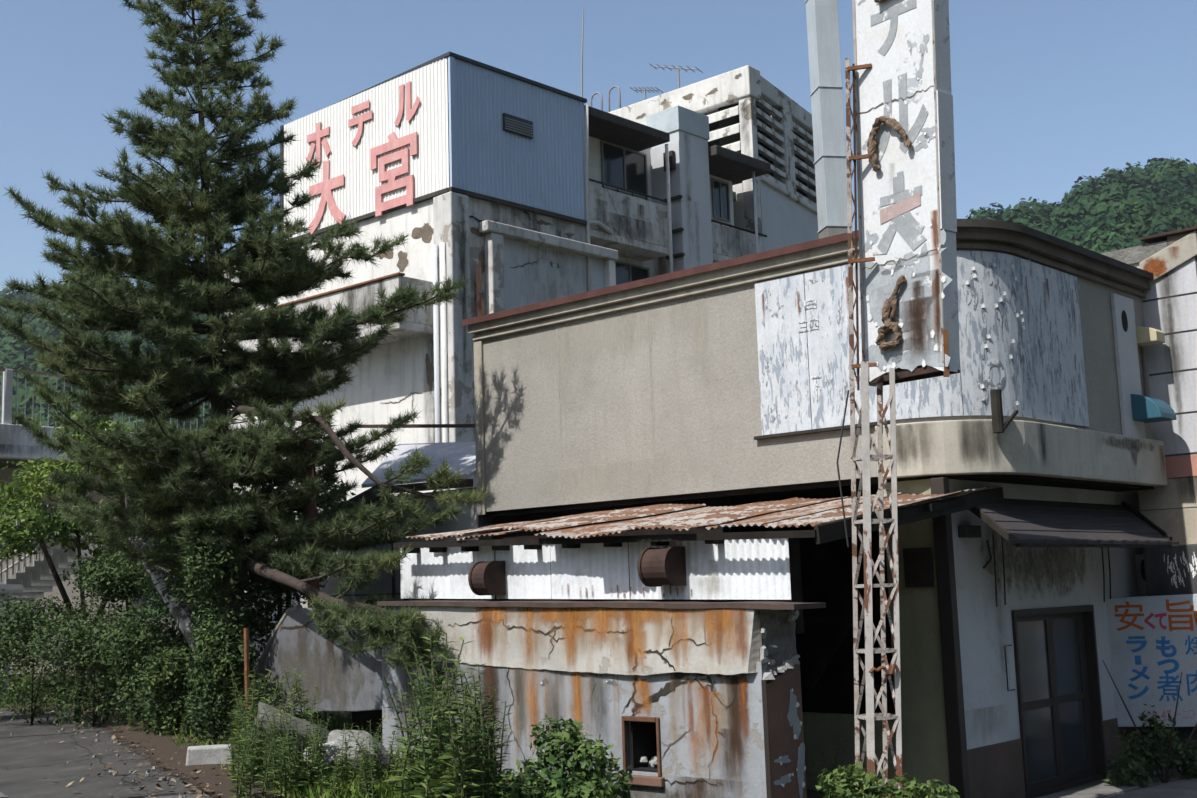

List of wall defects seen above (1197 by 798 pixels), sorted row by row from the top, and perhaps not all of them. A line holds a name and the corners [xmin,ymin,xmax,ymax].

spalling [375,248,408,272]
spalling [411,223,434,243]
corrosion [1144,247,1175,277]
peeling [964,261,1079,408]
corrosion [485,665,499,732]
crack [505,667,526,762]
corrosion [636,679,649,707]
crack [587,672,737,791]
corrosion [688,674,747,765]
peeling [774,688,806,798]
corrosion [685,777,721,798]